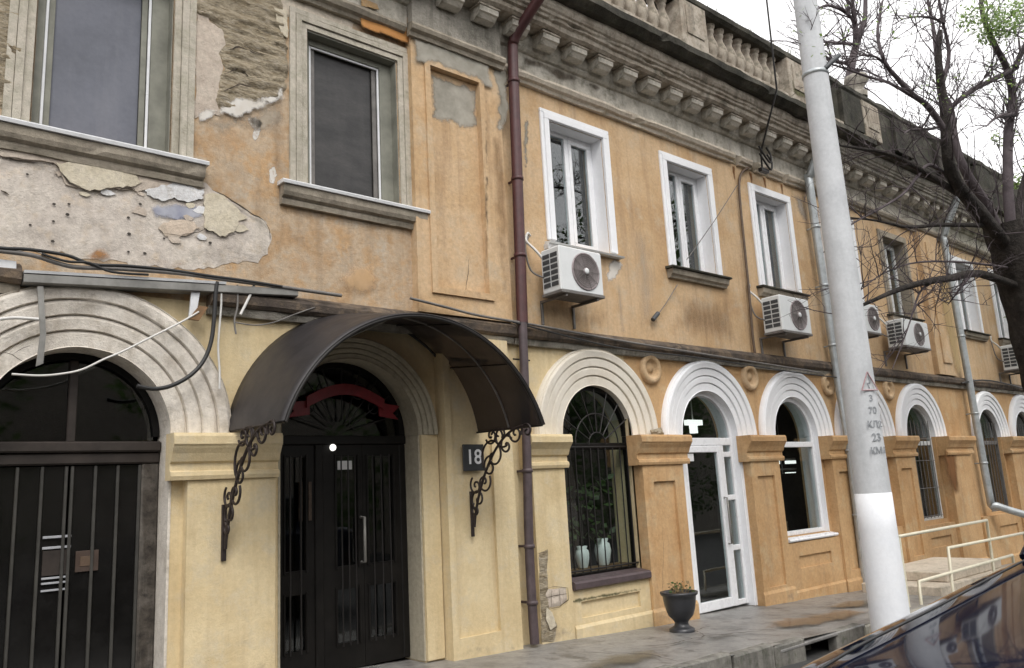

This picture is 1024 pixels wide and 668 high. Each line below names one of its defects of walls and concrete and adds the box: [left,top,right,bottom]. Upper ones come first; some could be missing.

spalling [197,0,289,117]
peeling [415,40,509,130]
flaking render [0,148,272,270]
spalling [536,549,569,645]